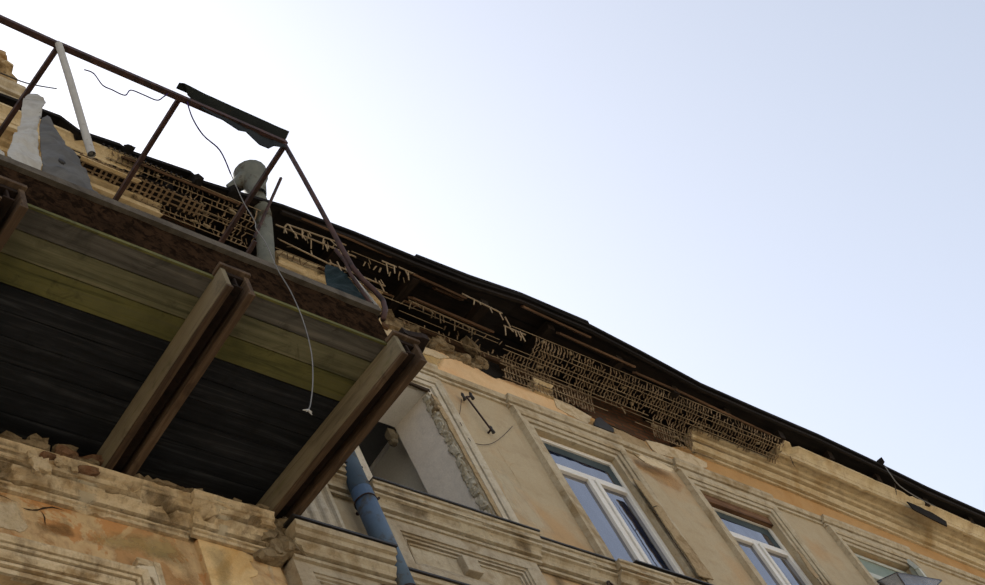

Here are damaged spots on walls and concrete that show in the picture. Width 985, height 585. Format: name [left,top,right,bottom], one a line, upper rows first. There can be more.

spalling [381,308,503,379]
crack [0,495,62,522]
spalling [0,430,104,478]
spalling [134,473,205,493]
peeling [197,498,309,585]
spalling [409,382,503,518]
flaking render [553,390,707,468]